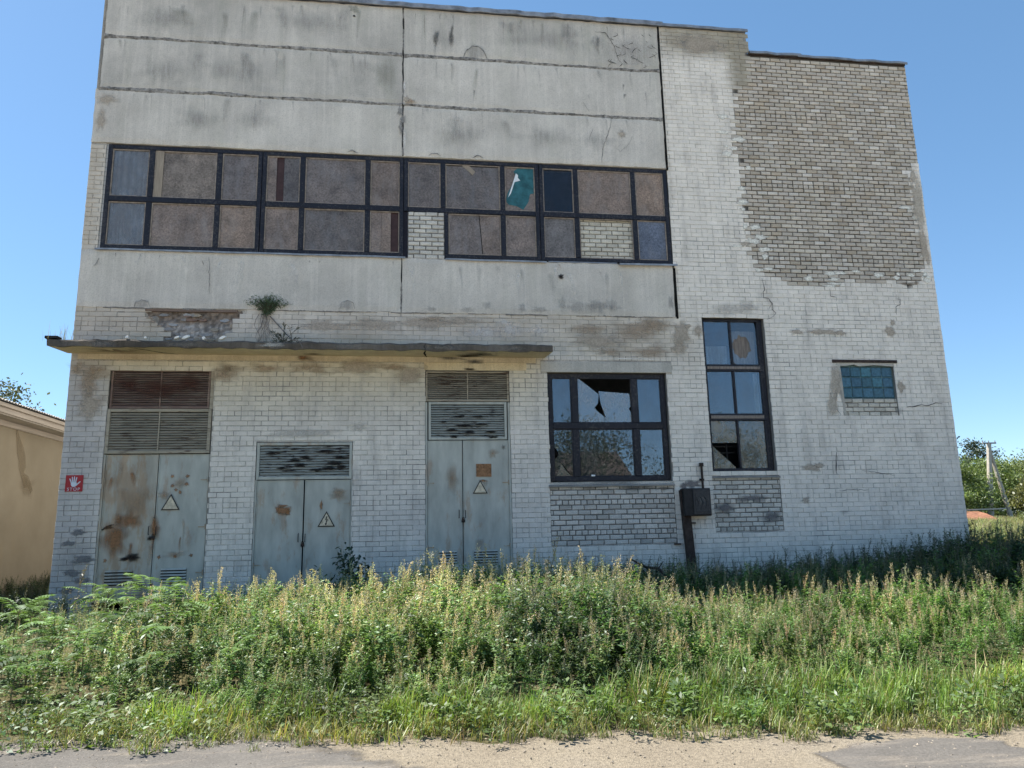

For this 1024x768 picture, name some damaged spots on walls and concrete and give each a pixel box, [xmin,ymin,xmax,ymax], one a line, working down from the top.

crack [602,32,656,68]
peeling [717,57,932,287]
spalling [134,299,243,342]
damp [445,353,488,370]
corrosion [101,497,140,562]
corrosion [276,505,290,515]